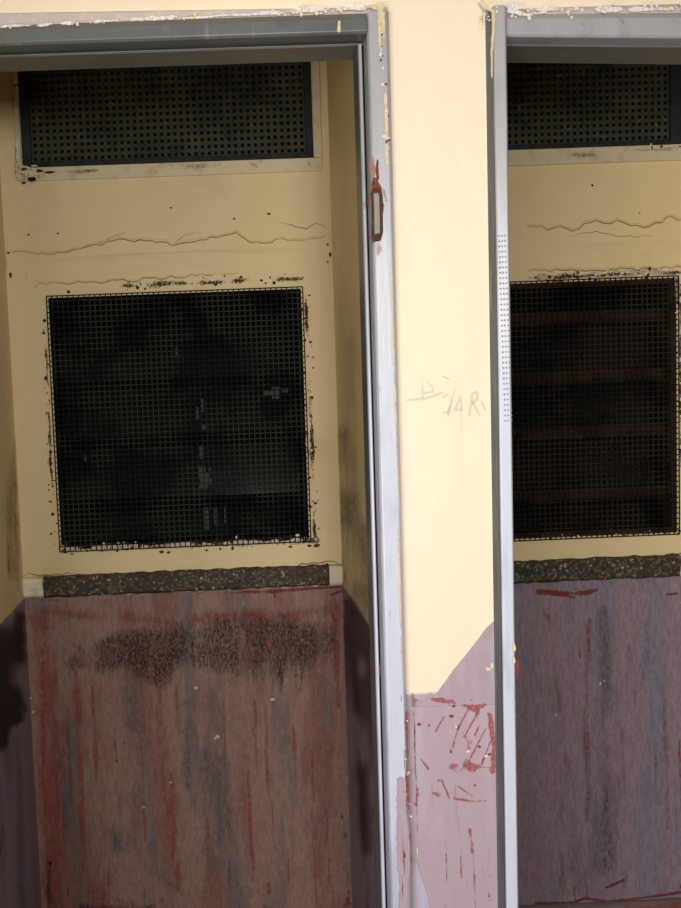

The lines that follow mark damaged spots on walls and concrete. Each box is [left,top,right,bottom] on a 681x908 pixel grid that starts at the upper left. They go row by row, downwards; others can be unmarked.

peeling [595,2,681,14]
peeling [0,2,386,70]
peeling [481,0,584,78]
peeling [381,83,390,166]
flaking render [15,117,55,184]
corrosion [367,160,384,207]
crack [12,222,327,255]
crack [526,214,681,238]
crack [34,271,238,287]
crack [528,264,681,272]
water stain [97,586,343,683]